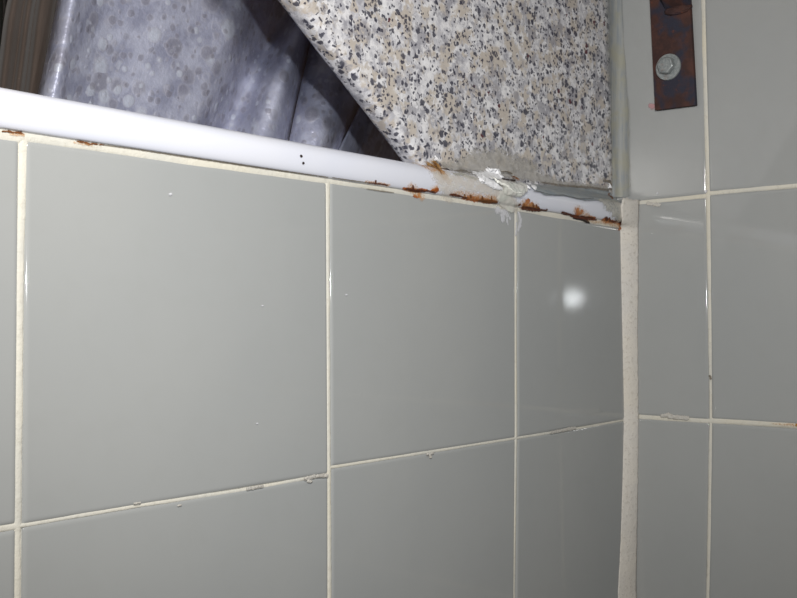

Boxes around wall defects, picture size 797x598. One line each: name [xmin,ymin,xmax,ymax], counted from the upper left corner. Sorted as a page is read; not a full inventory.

rust [402,185,439,198]
rust [449,193,498,204]
rust [516,199,547,212]
rust [561,207,622,231]